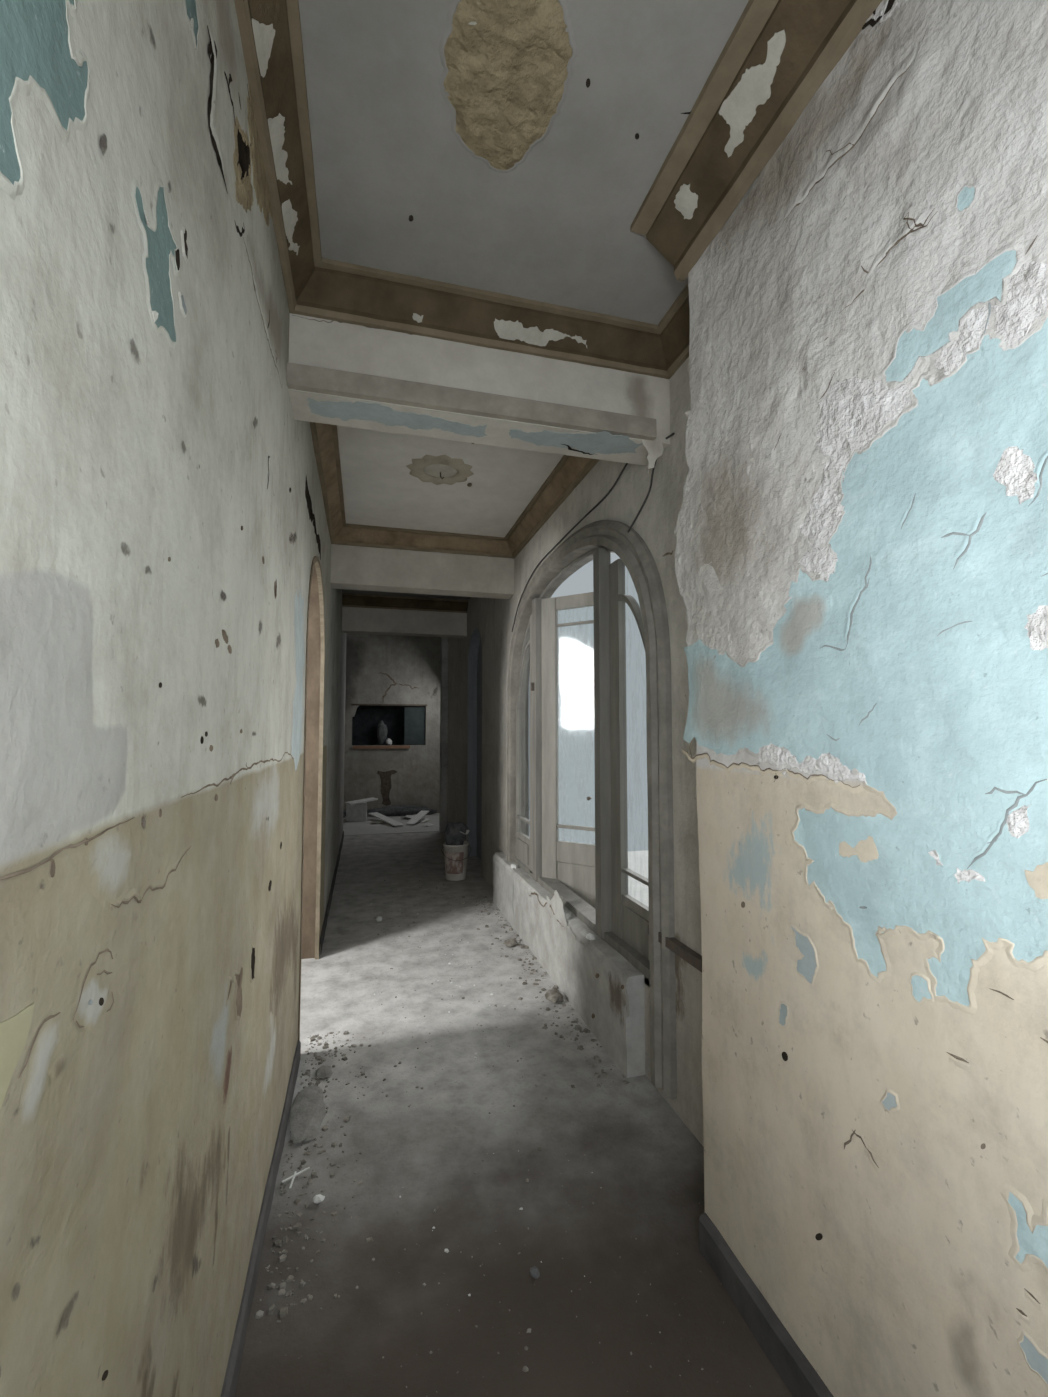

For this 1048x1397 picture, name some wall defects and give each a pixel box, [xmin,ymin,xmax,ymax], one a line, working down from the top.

peeling [0,0,90,201]
peeling [719,30,786,157]
crack [194,6,413,387]
peeling [131,176,188,349]
peeling [494,319,587,348]
crack [819,556,872,651]
peeling [713,241,1048,1014]
crack [181,752,294,798]
crack [0,817,135,880]
crack [967,779,1047,869]
crack [844,1130,879,1171]
peeling [1001,1181,1048,1275]